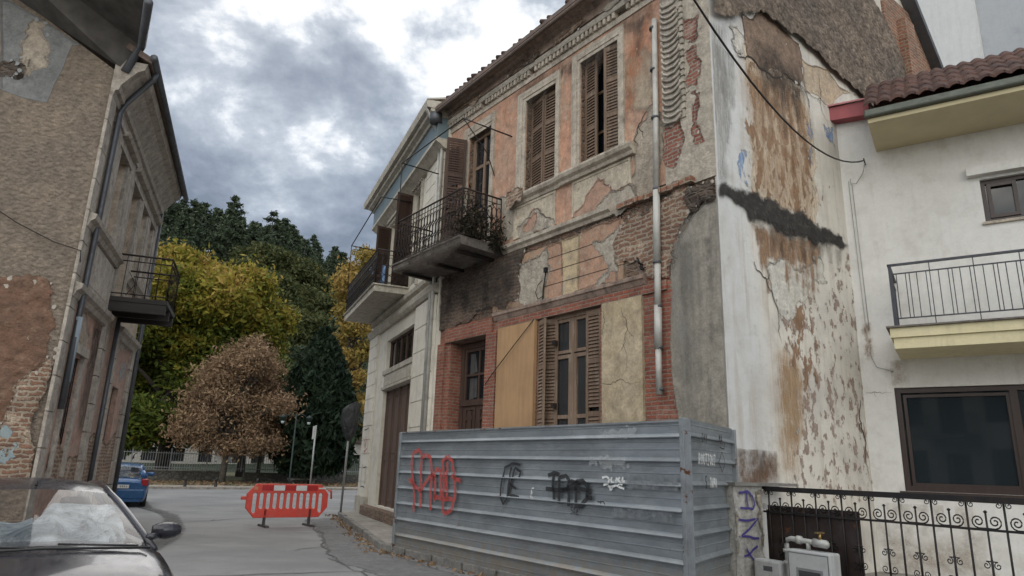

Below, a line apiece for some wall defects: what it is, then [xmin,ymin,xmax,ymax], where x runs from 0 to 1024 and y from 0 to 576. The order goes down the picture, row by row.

peeling [0,17,51,80]
flaking render [573,14,715,286]
leakage [719,161,847,249]
peeling [730,11,856,223]
flaking render [0,274,58,477]
peeling [767,254,873,501]